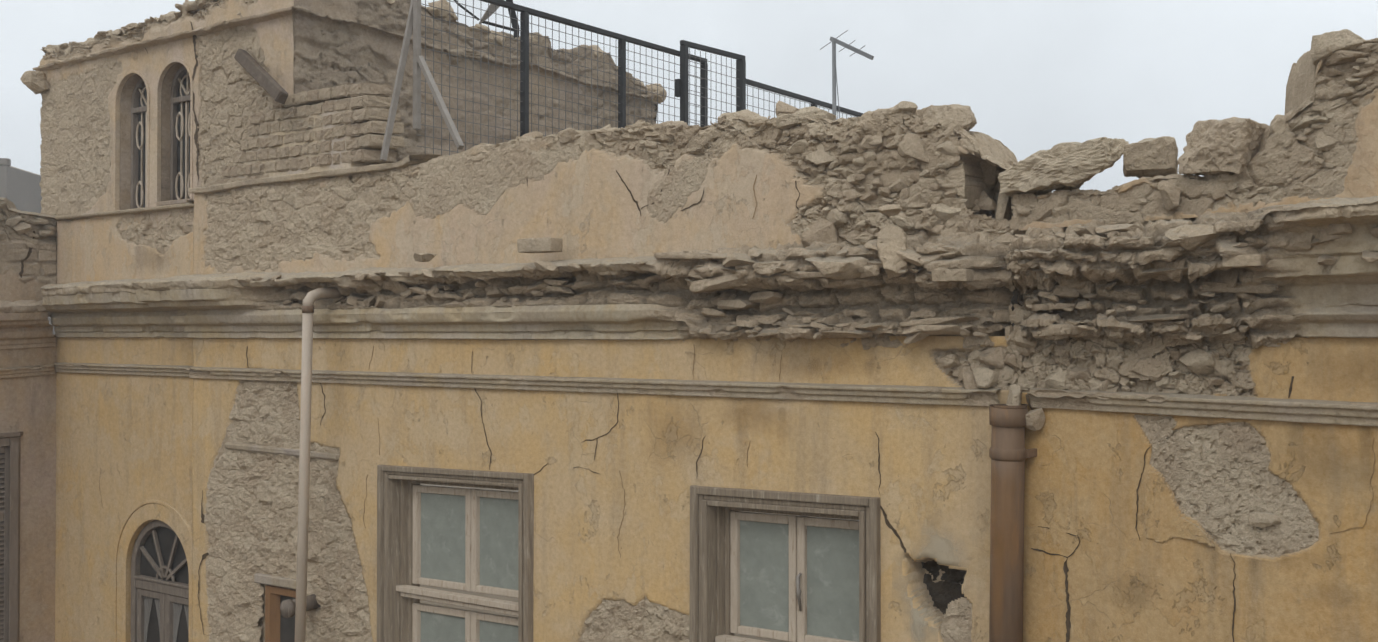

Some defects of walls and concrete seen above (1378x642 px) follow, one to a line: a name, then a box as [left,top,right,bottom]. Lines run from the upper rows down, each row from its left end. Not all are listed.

spalling [39,58,123,221]
spalling [118,11,1378,274]
crack [19,231,36,278]
crack [471,351,492,468]
spalling [204,380,373,642]
crack [533,393,625,557]
crack [875,432,909,554]
spalling [1134,415,1319,557]
crack [1329,440,1375,534]
spalling [579,596,690,642]
spalling [921,560,972,642]
crack [1031,526,1080,642]